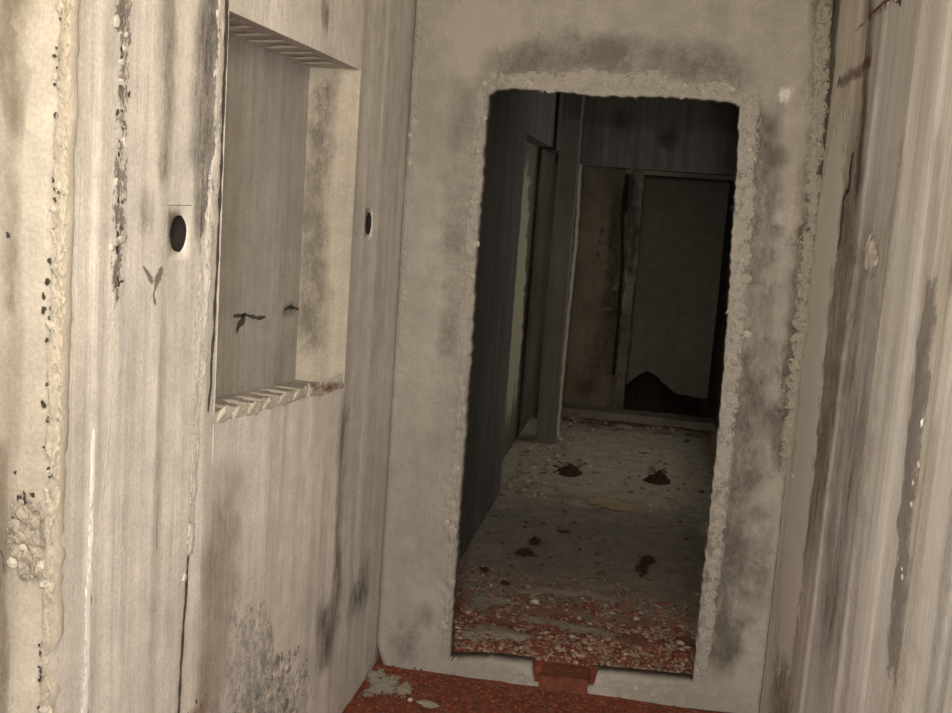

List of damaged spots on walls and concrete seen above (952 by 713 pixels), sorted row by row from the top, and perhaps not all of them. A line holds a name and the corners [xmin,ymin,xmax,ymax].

damp [499,39,628,75]
spalling [4,0,74,713]
crack [143,266,163,305]
crack [178,0,298,713]
damp [729,350,765,505]
damp [742,114,780,277]
damp [777,328,803,460]
damp [789,194,819,257]
damp [709,514,746,663]